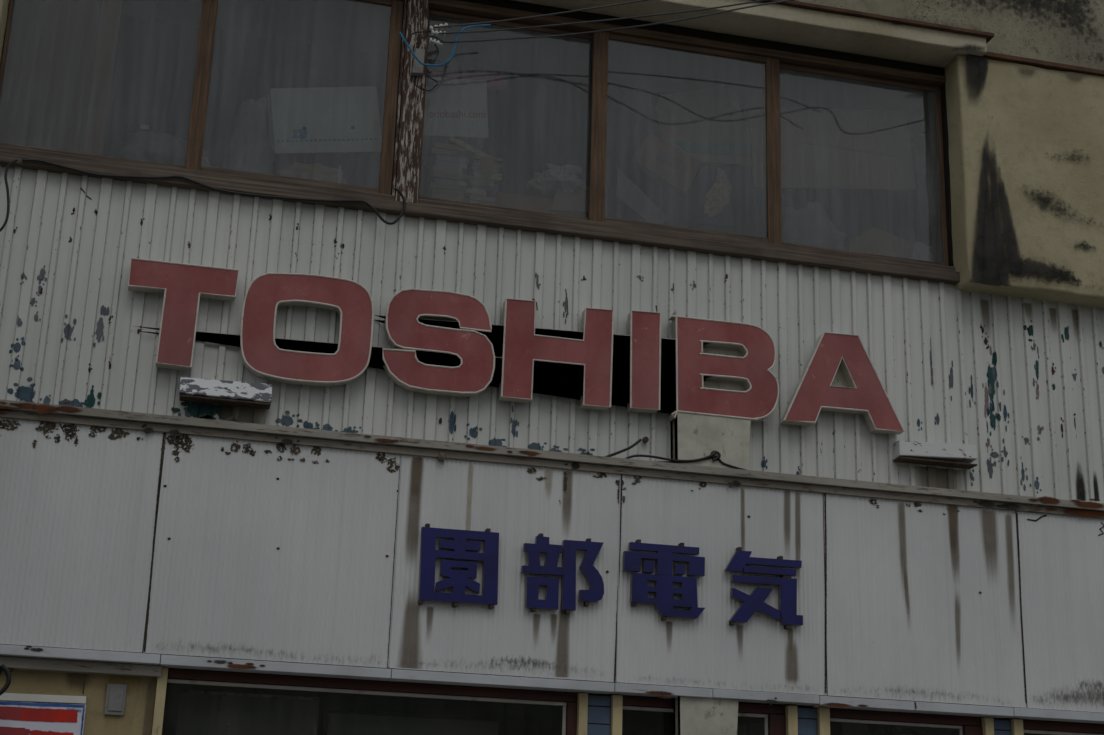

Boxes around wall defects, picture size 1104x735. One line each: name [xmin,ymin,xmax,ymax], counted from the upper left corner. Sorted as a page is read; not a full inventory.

water stain [971,139,1093,287]
peeling [7,265,102,408]
peeling [93,305,109,347]
peeling [1023,320,1056,399]
peeling [171,402,237,422]
peeling [275,411,361,433]
peeling [969,325,1009,479]
water stain [408,457,422,548]
water stain [949,505,958,568]
water stain [973,501,1019,600]
water stain [1076,469,1099,501]
water stain [401,603,433,669]